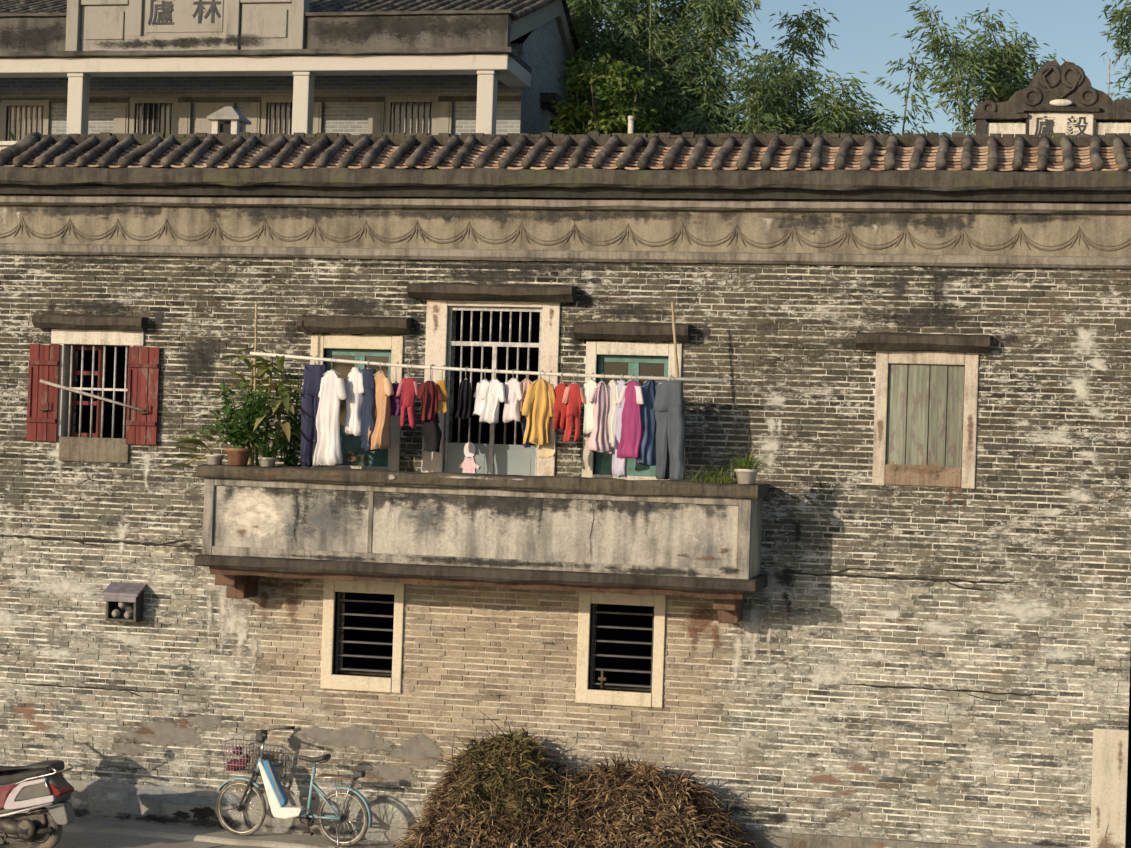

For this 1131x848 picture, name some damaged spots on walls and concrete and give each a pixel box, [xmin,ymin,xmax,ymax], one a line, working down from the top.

damp [3,206,160,223]
damp [243,207,689,223]
damp [763,212,975,237]
damp [1010,213,1086,223]
damp [224,471,572,538]
damp [582,500,725,544]
crack [0,535,202,547]
damp [410,555,592,571]
damp [609,566,699,576]
crack [772,568,1026,591]
rust [688,608,719,649]